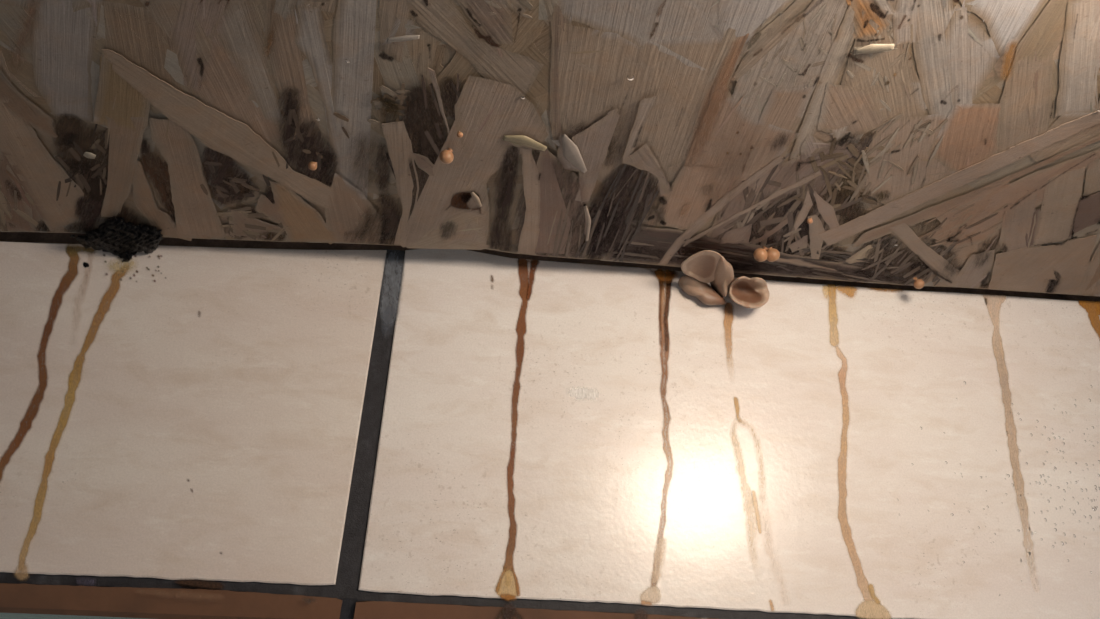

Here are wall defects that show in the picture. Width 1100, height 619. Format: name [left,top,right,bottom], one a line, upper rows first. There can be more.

leakage [55,115,138,233]
leakage [141,141,175,219]
leakage [0,245,162,579]